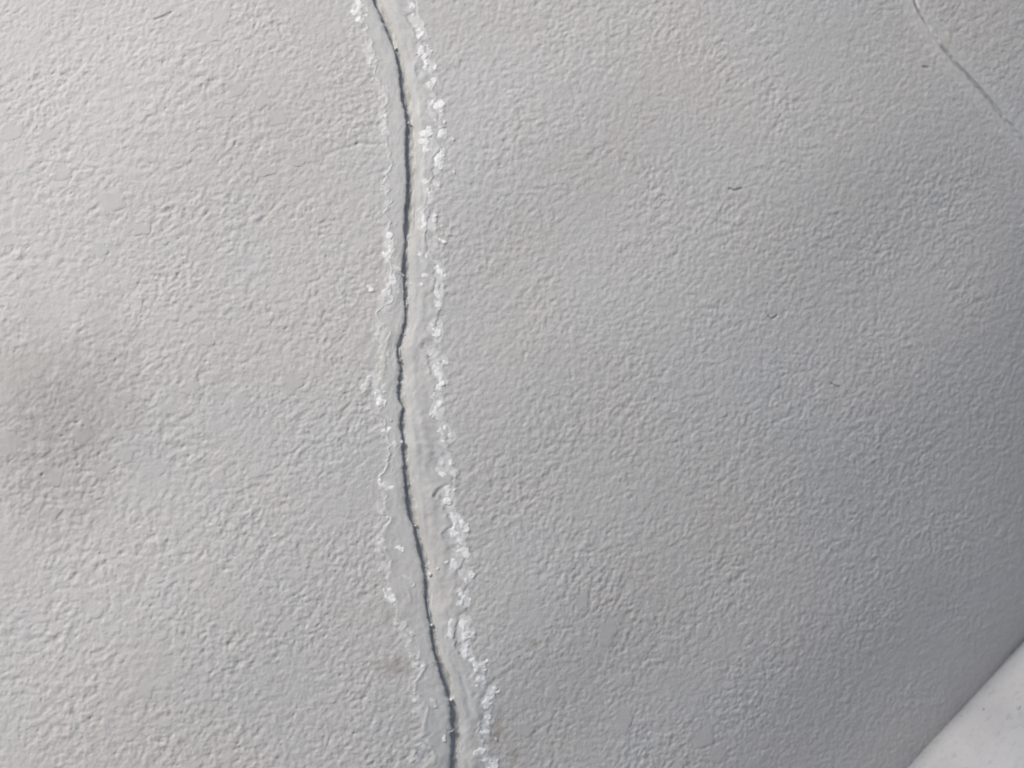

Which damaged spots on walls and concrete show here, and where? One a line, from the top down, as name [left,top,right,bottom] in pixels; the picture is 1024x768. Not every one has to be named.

crack [373,0,460,768]